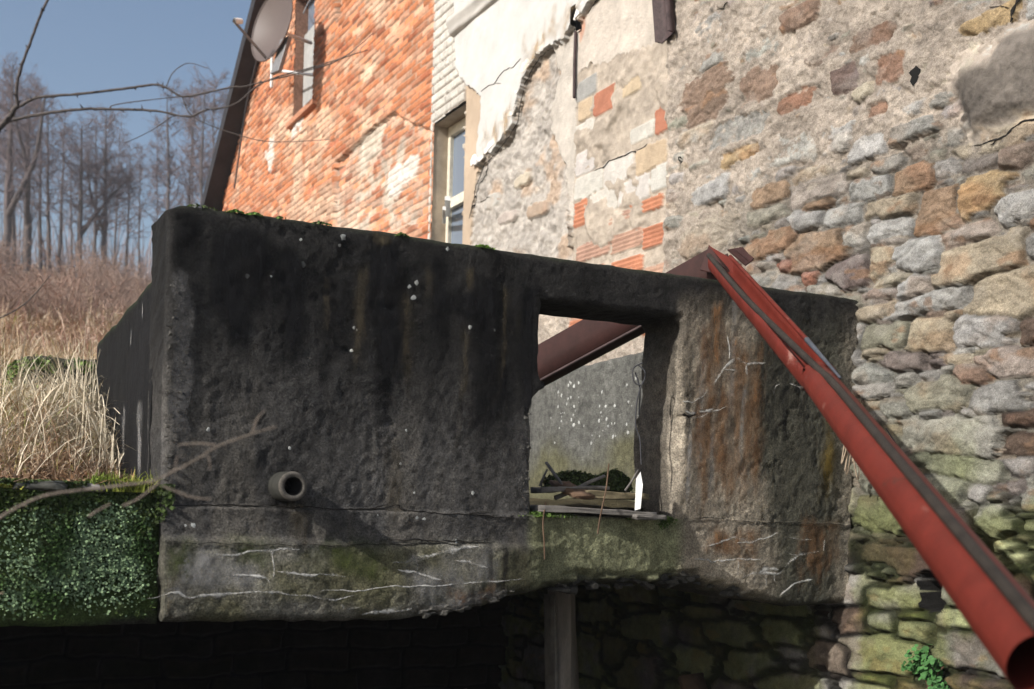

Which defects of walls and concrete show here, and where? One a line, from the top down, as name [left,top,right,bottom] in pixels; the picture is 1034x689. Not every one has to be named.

flaking render [573,0,655,72]
flaking render [470,42,574,260]
crack [974,119,1034,146]
water stain [208,227,305,359]
water stain [519,286,541,412]
crack [682,336,764,418]
water stain [273,470,294,513]
crack [163,504,527,614]
crack [687,517,849,595]